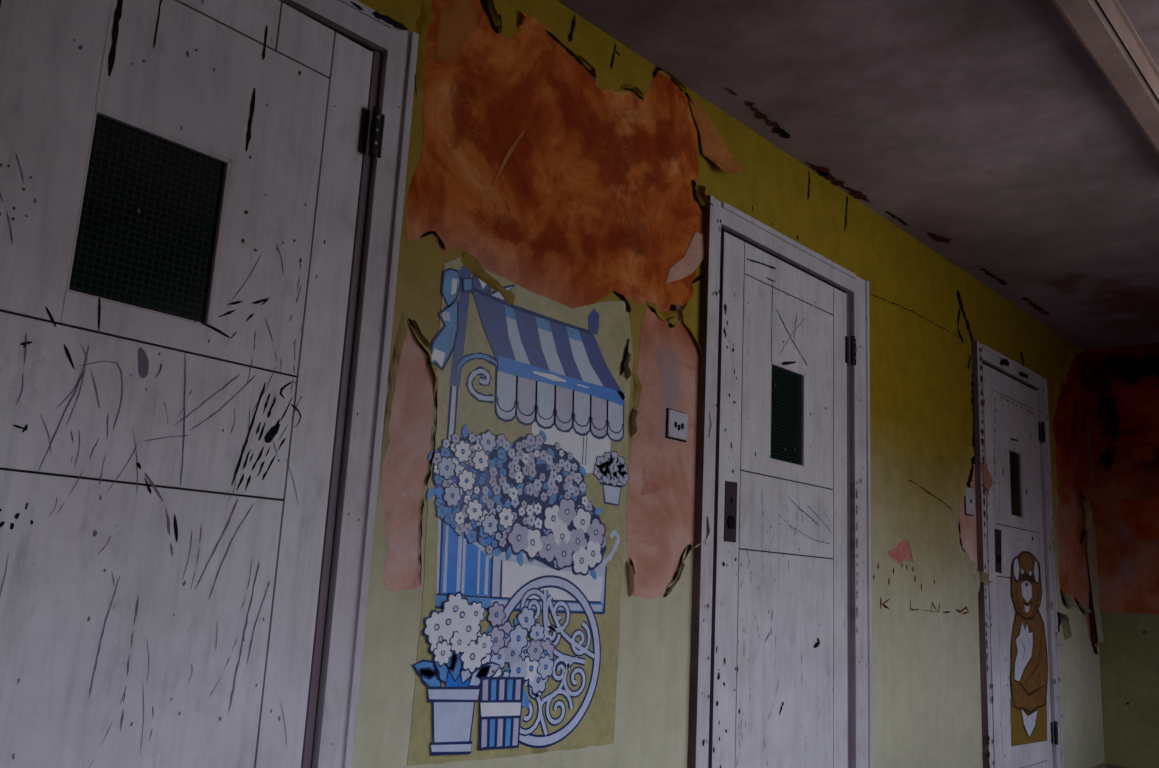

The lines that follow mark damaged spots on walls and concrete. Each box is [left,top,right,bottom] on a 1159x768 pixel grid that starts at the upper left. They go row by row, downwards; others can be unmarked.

flaking render [350,0,743,599]
flaking render [955,348,993,599]
flaking render [1043,346,1104,654]